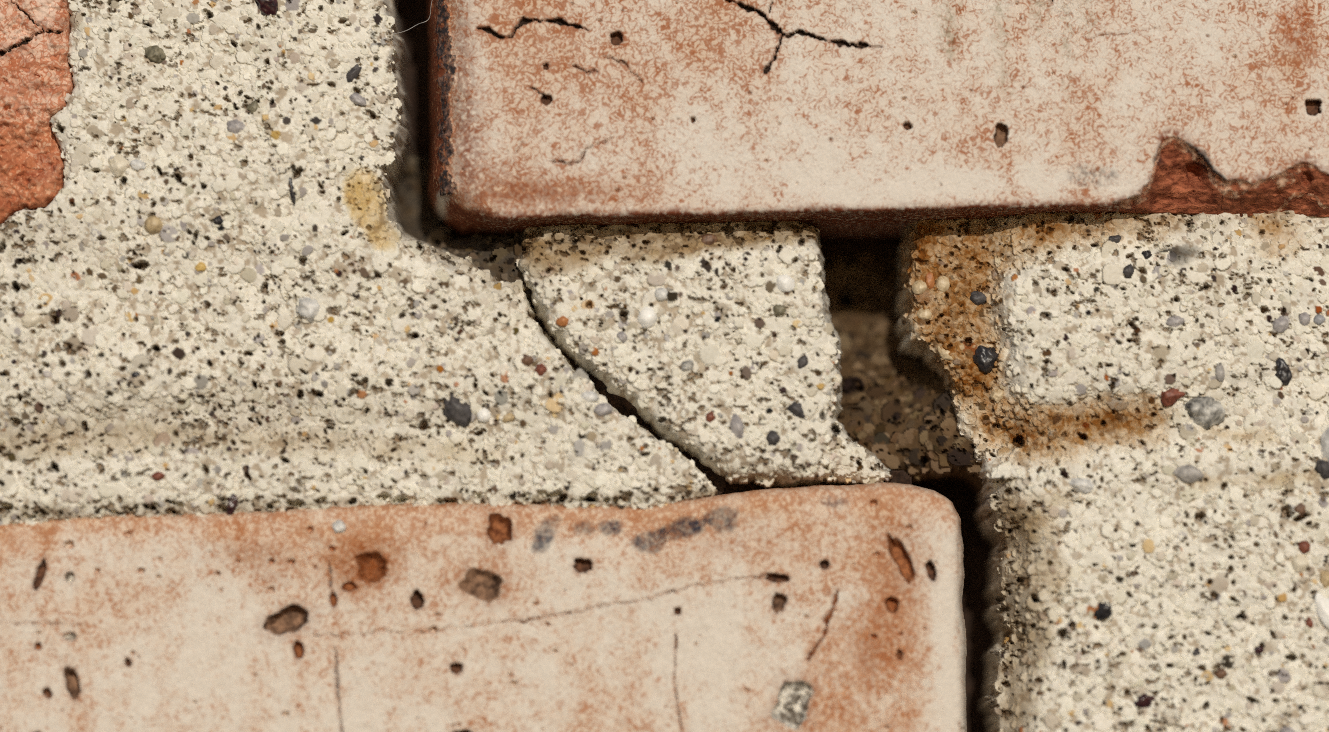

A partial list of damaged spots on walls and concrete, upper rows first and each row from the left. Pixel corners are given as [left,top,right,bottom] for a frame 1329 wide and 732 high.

crack [0,0,64,56]
crack [477,18,589,39]
crack [731,0,878,74]
spalling [1119,136,1329,217]
crack [531,303,850,495]